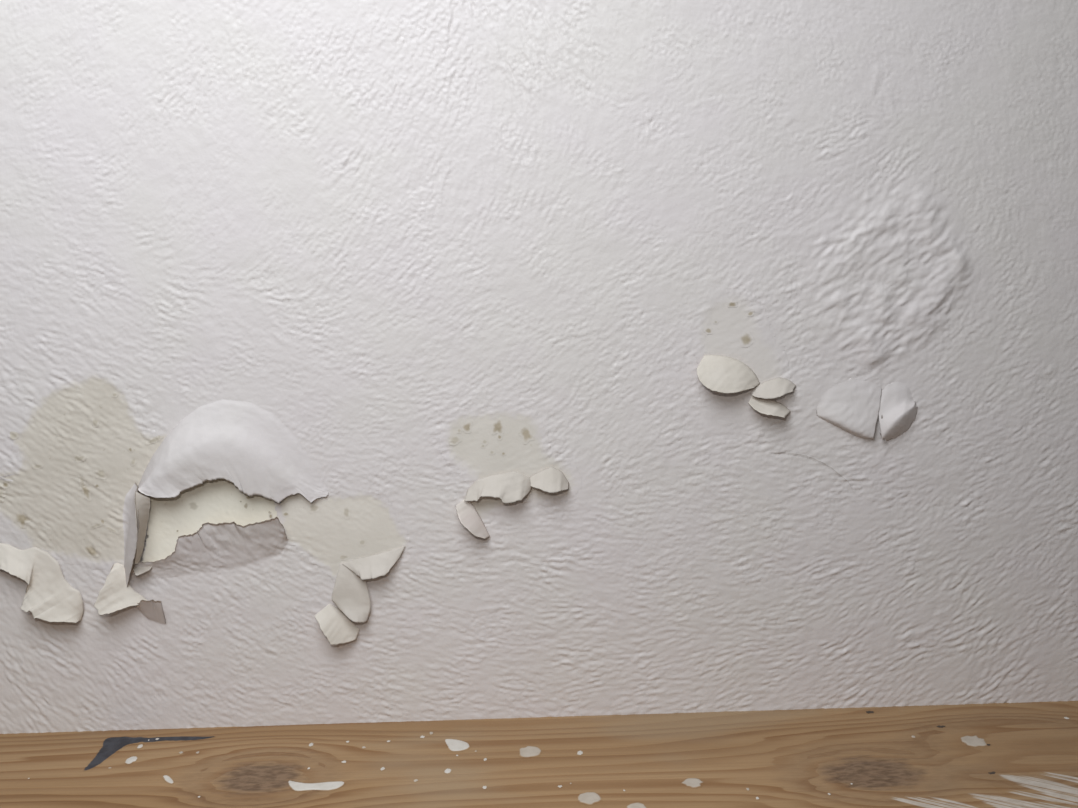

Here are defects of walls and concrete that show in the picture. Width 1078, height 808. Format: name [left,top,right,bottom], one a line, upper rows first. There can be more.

peeling [0,370,412,645]
peeling [438,404,582,539]
peeling [690,286,796,418]
peeling [816,378,918,442]